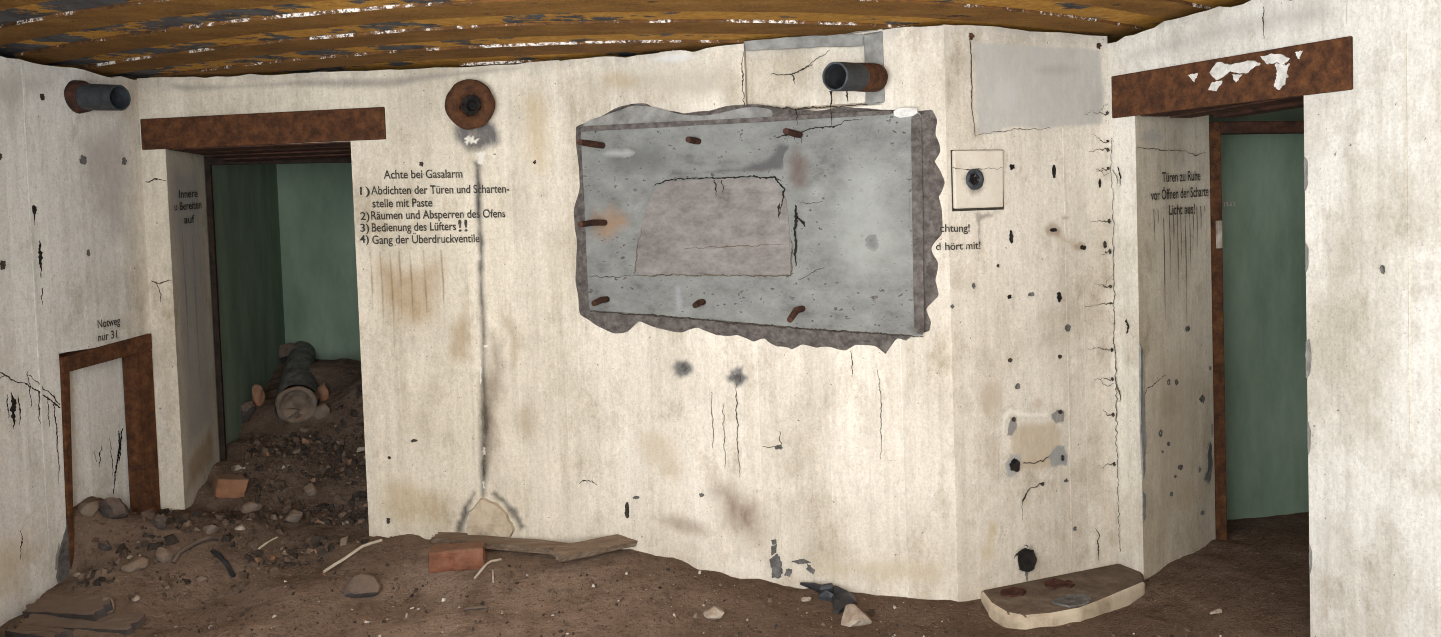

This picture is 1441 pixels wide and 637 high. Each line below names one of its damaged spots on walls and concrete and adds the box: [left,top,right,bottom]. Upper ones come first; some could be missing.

peeling [1188,51,1303,91]
rust [585,198,634,246]
water stain [363,158,535,500]
water stain [1144,206,1209,552]
water stain [372,471,455,534]